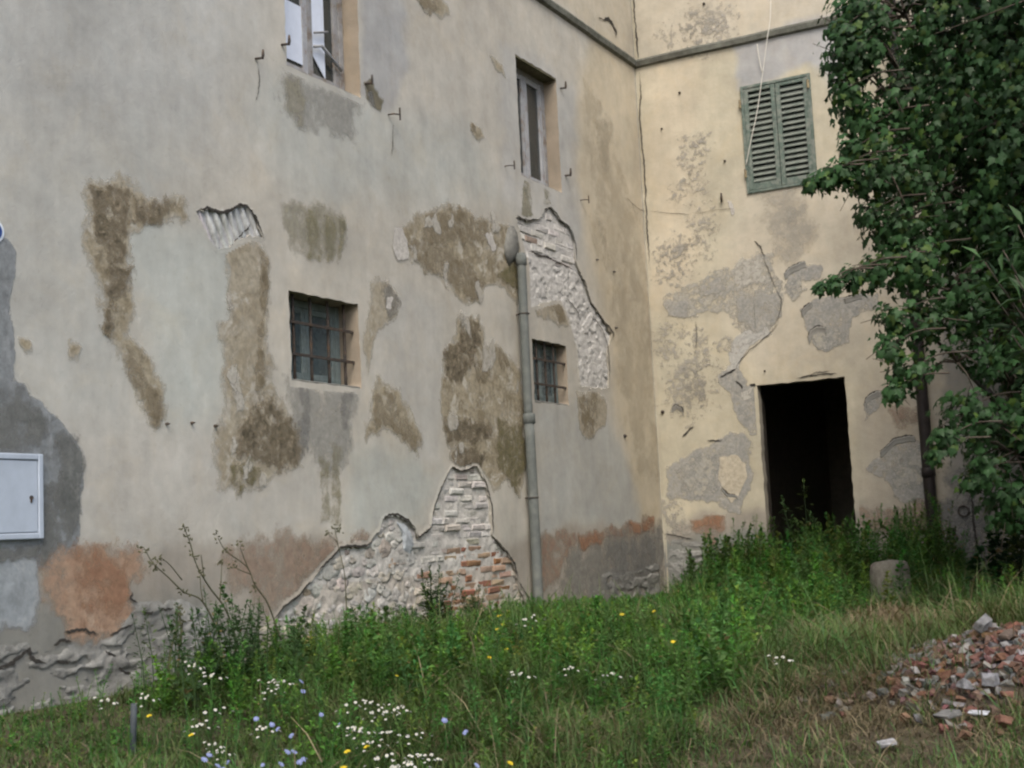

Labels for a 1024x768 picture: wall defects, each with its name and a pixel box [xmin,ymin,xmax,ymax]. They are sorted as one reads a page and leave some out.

crack [599,0,639,55]
water stain [81,172,188,427]
spalling [194,200,265,254]
water stain [214,242,358,524]
water stain [365,376,422,457]
water stain [393,203,527,498]
spalling [514,204,614,393]
crack [627,82,724,260]
peeling [593,131,882,603]
crack [720,241,782,389]
spalling [259,463,530,640]
spalling [0,599,216,715]